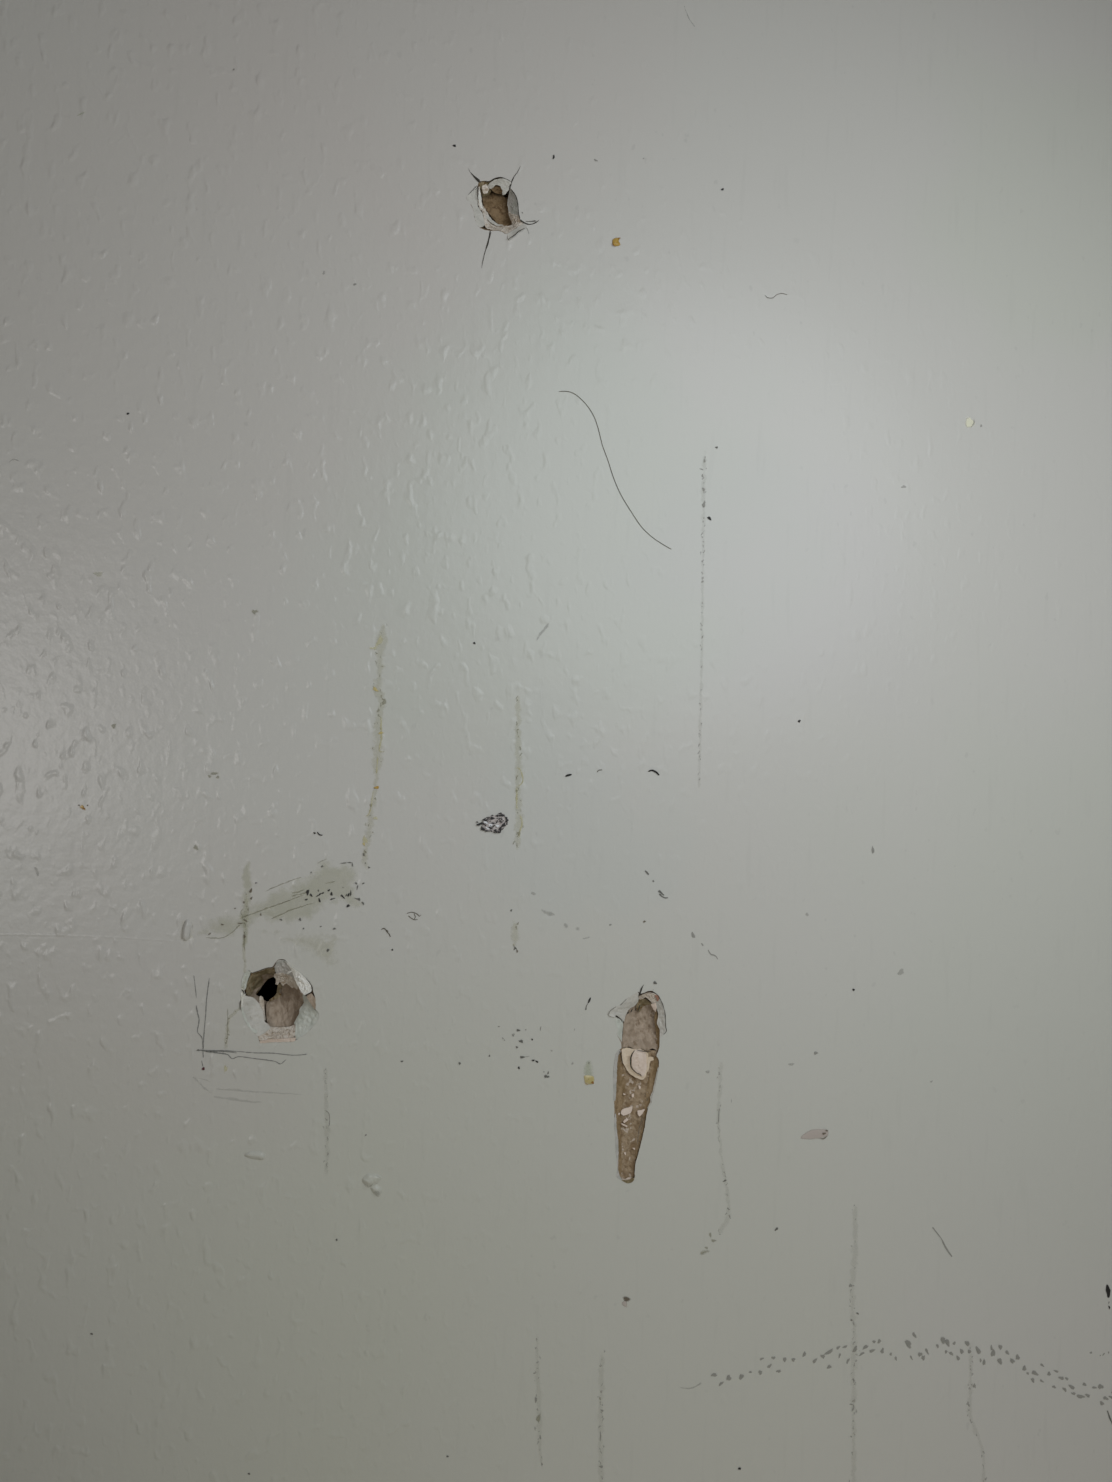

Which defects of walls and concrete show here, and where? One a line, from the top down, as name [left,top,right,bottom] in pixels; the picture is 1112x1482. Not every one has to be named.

peeling [241,970,251,1005]
peeling [284,960,312,995]
peeling [613,1047,659,1183]